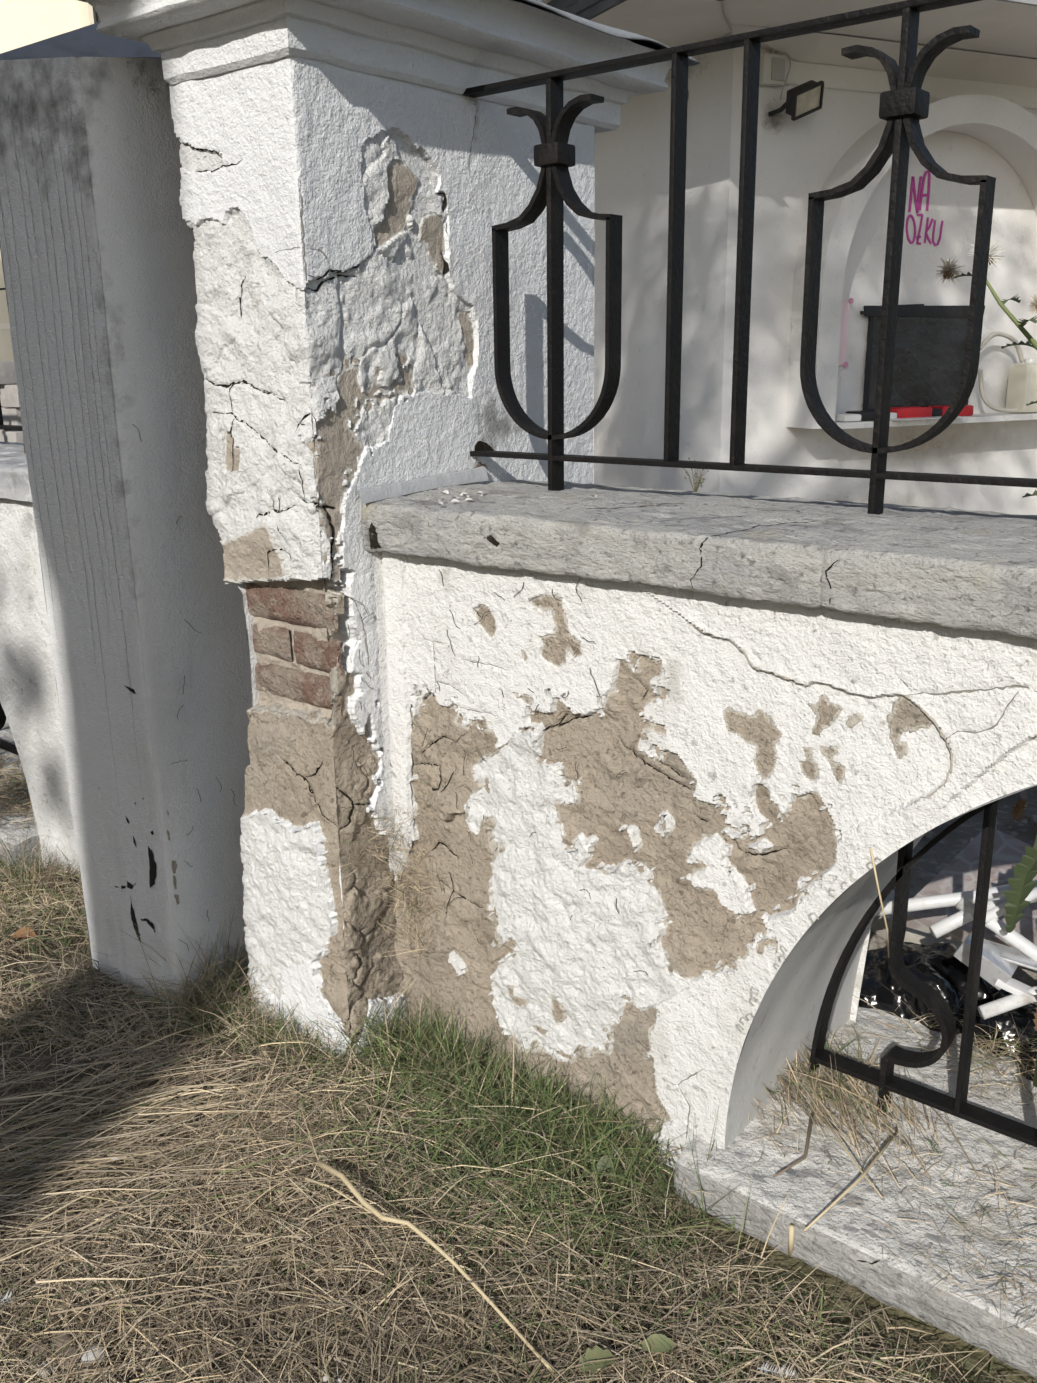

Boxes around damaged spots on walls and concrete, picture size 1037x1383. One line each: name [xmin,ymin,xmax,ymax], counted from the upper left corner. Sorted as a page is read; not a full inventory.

peeling [179,138,223,173]
crack [183,143,240,172]
crack [275,180,370,292]
crack [437,111,478,274]
crack [206,379,369,665]
crack [589,503,889,589]
crack [825,560,838,604]
peeling [186,129,953,1152]